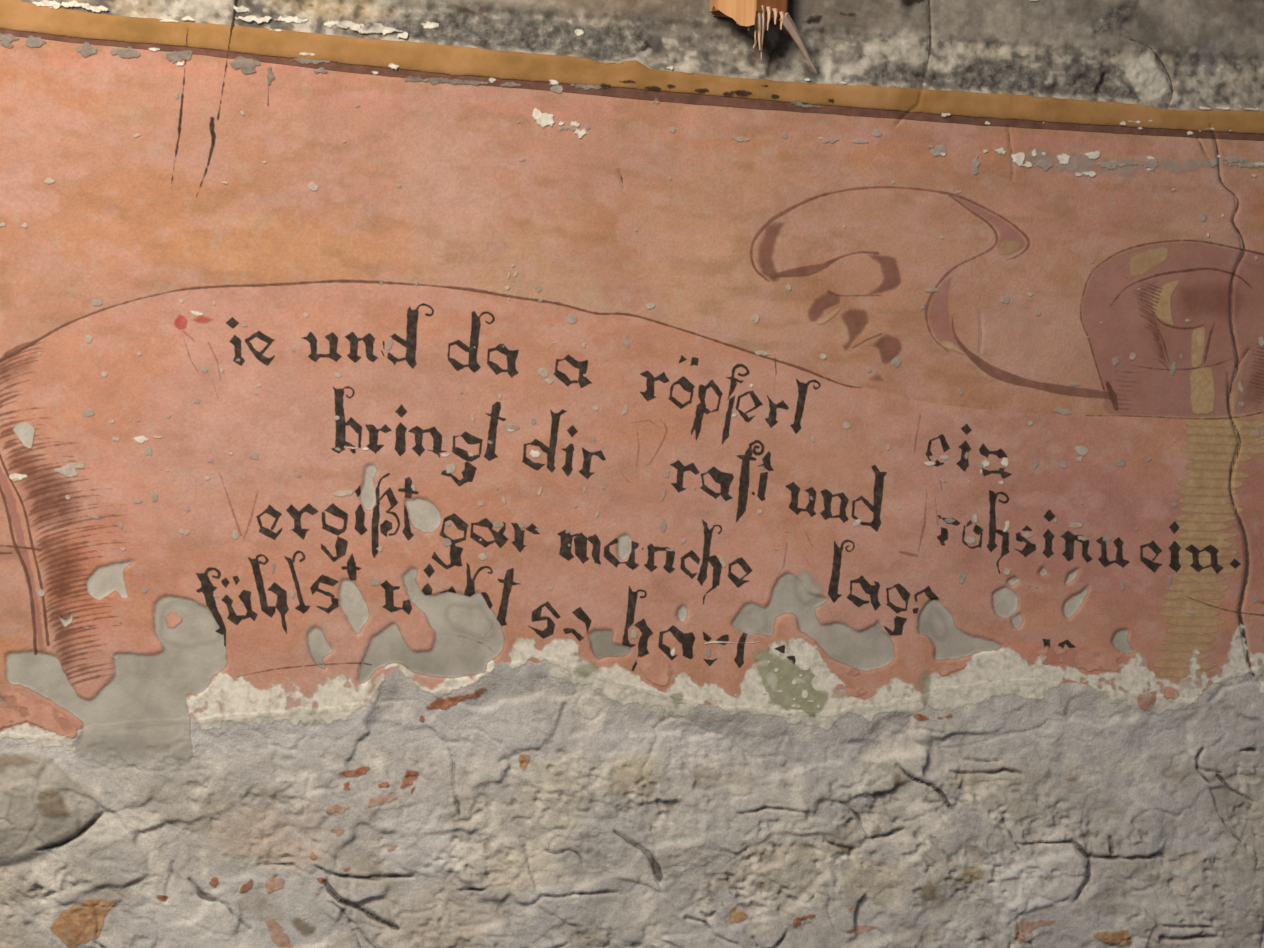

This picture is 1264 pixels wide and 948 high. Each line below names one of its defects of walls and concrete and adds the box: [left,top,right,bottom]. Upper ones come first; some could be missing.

peeling [76,42,192,66]
peeling [229,56,274,84]
peeling [533,108,590,138]
peeling [972,148,1264,177]
crack [1199,132,1254,676]
spalling [87,548,148,600]
flaking render [0,567,1264,948]
crack [902,769,952,809]
crack [45,813,103,849]
crack [614,831,662,881]
crack [1009,831,1151,901]
crack [324,872,400,948]